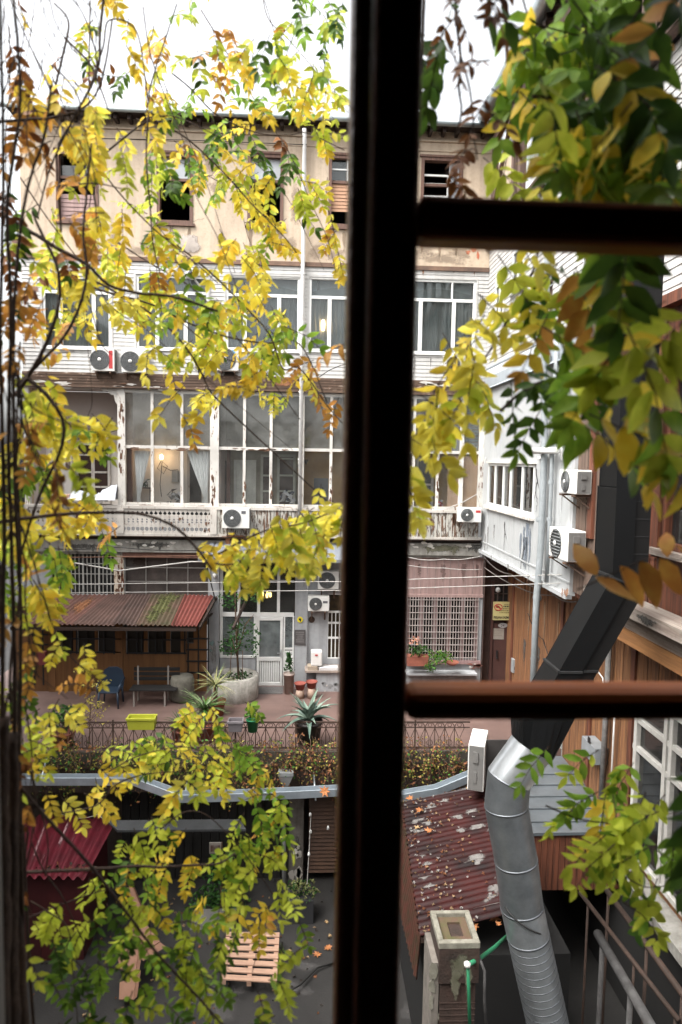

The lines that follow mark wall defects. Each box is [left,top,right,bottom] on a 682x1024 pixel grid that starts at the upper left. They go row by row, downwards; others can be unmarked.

peeling [410,473,456,549]
leakage [450,969,473,1000]